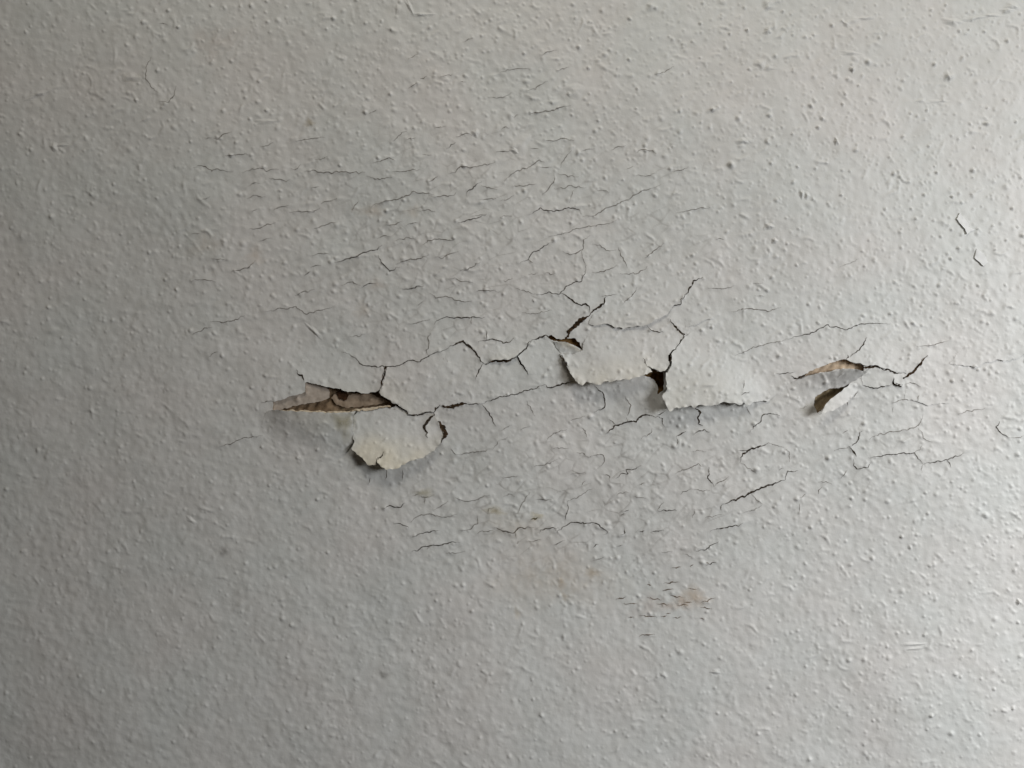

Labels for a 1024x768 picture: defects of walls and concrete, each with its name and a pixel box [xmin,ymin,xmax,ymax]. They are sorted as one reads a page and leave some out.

peeling [273,352,471,470]
crack [191,50,963,637]
peeling [474,270,964,415]